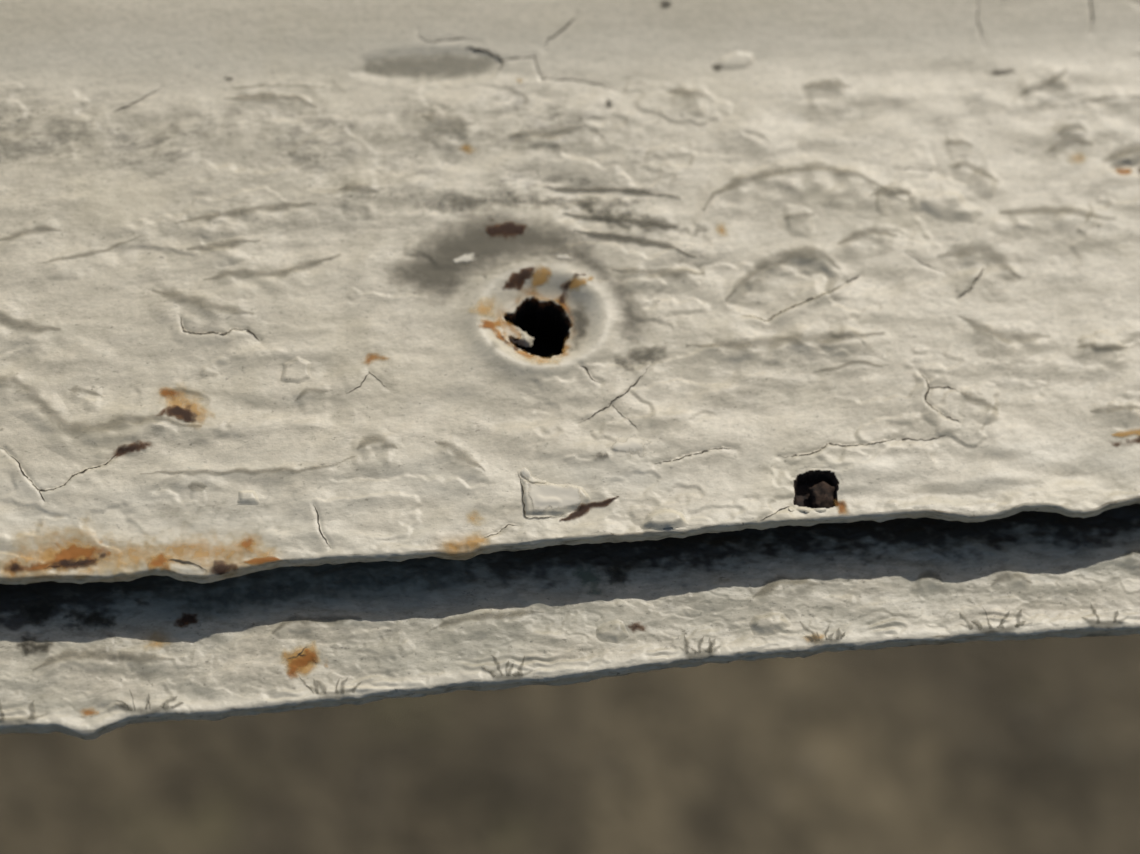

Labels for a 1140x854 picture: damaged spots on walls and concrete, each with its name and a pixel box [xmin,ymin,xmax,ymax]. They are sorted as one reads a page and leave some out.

water stain [564,213,694,257]
crack [181,318,260,341]
water stain [571,310,587,337]
rust [161,389,201,422]
crack [580,365,651,430]
crack [2,448,124,501]
rust [5,539,280,576]
water stain [66,606,115,626]
water stain [17,638,50,655]
rust [284,647,317,677]